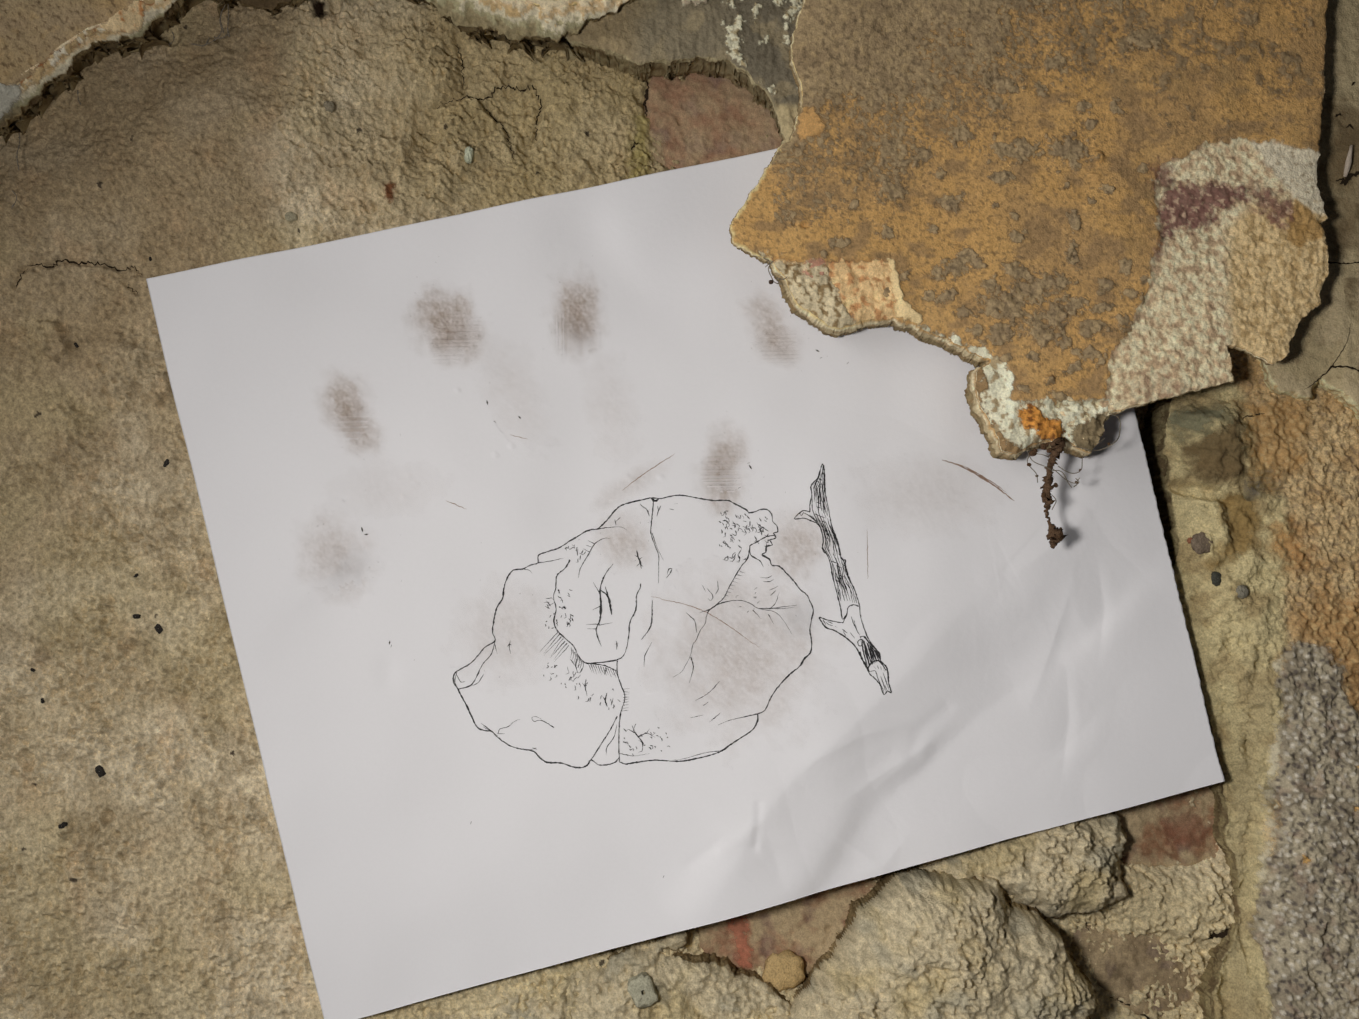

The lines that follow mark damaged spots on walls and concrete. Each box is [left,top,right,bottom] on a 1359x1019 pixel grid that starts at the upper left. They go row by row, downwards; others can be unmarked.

peeling [0,0,145,118]
peeling [721,0,1329,454]
crack [1307,324,1359,388]
spalling [1248,641,1359,1019]